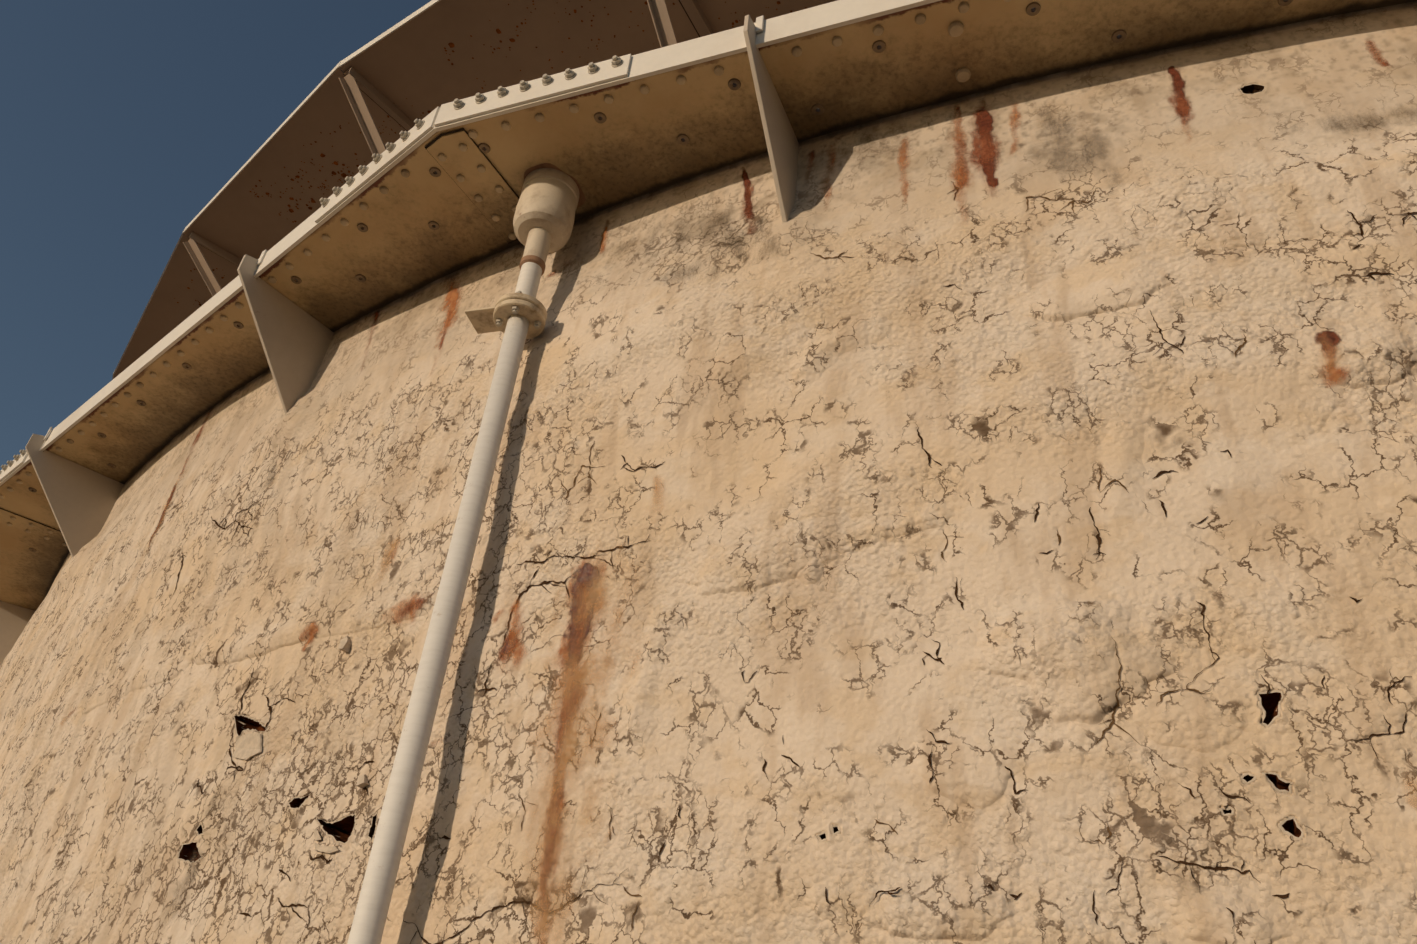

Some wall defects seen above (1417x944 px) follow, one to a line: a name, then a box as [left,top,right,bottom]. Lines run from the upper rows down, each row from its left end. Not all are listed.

rust [1168,66,1191,122]
rust [954,101,1015,189]
rust [742,168,754,232]
rust [1315,330,1346,383]
crack [1089,467,1208,559]
crack [941,532,964,610]
peeling [233,733,262,760]
rust [540,562,603,925]
crack [922,640,944,664]
crack [1096,638,1142,746]
crack [1156,601,1220,706]
crack [1355,676,1412,760]